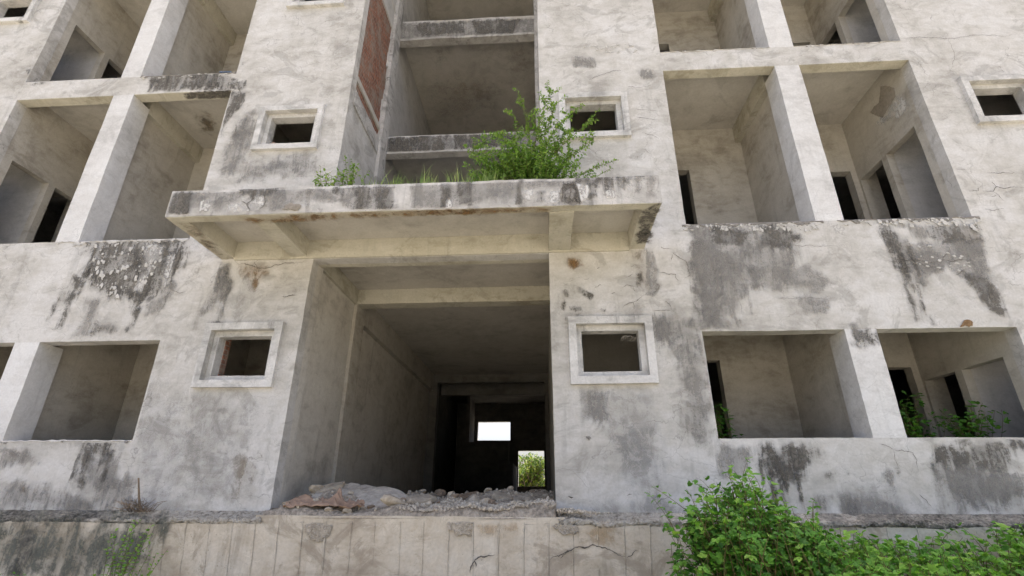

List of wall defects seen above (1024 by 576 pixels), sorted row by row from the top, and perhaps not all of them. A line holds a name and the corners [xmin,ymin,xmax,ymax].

peeling [870,86,906,123]
water stain [148,74,654,223]
water stain [52,240,185,334]
water stain [636,204,660,296]
water stain [879,224,1007,319]
water stain [657,225,830,439]
water stain [4,443,132,511]
water stain [719,443,819,502]
water stain [841,495,906,516]
water stain [932,439,1024,515]
crack [551,544,637,559]